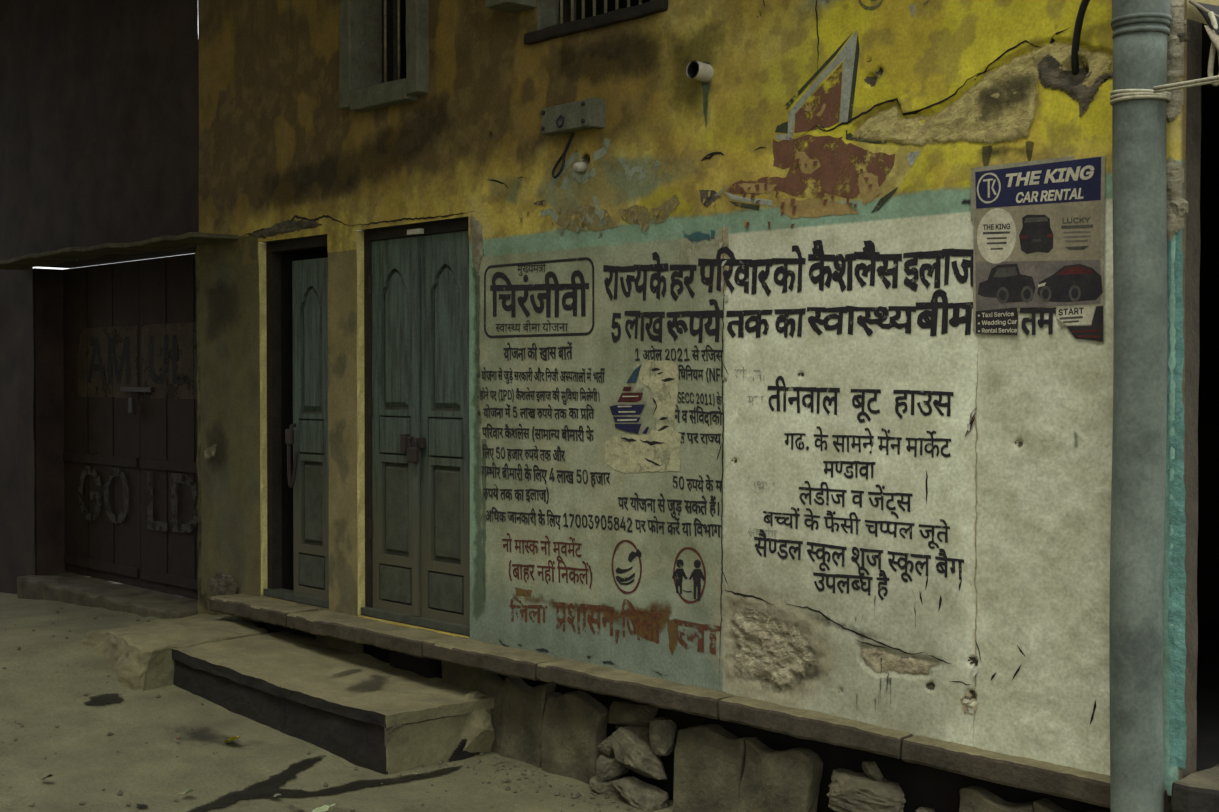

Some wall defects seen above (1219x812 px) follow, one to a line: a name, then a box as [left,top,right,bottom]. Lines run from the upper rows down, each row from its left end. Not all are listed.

spalling [852,42,1113,145]
peeling [520,195,680,239]
peeling [794,151,820,174]
peeling [739,168,880,229]
crack [717,239,982,747]
spalling [730,603,817,692]